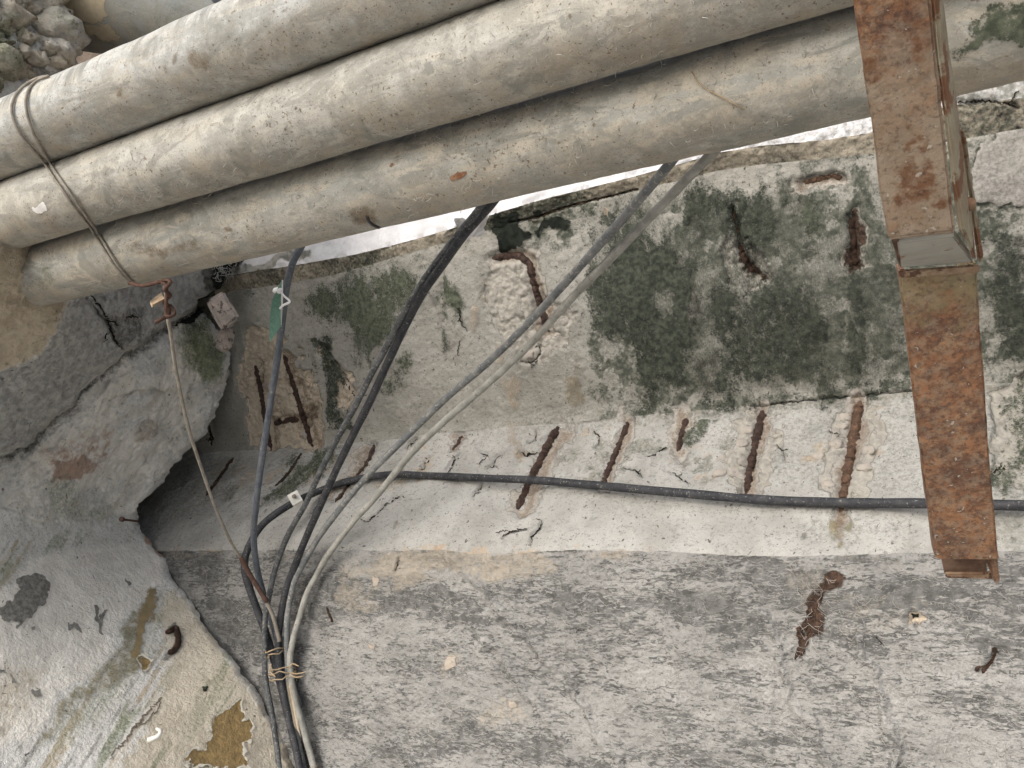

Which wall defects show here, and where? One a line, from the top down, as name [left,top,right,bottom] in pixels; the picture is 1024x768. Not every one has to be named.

crack [91,295,139,349]
spalling [235,326,325,452]
corrosion [505,413,576,518]
spalling [713,417,785,494]
corrosion [735,397,777,495]
spalling [812,406,888,498]
corrosion [828,387,876,547]
crack [496,518,542,543]
peeling [0,573,50,630]
corrosion [164,622,182,660]
corrosion [794,570,846,661]
peeling [182,698,255,768]